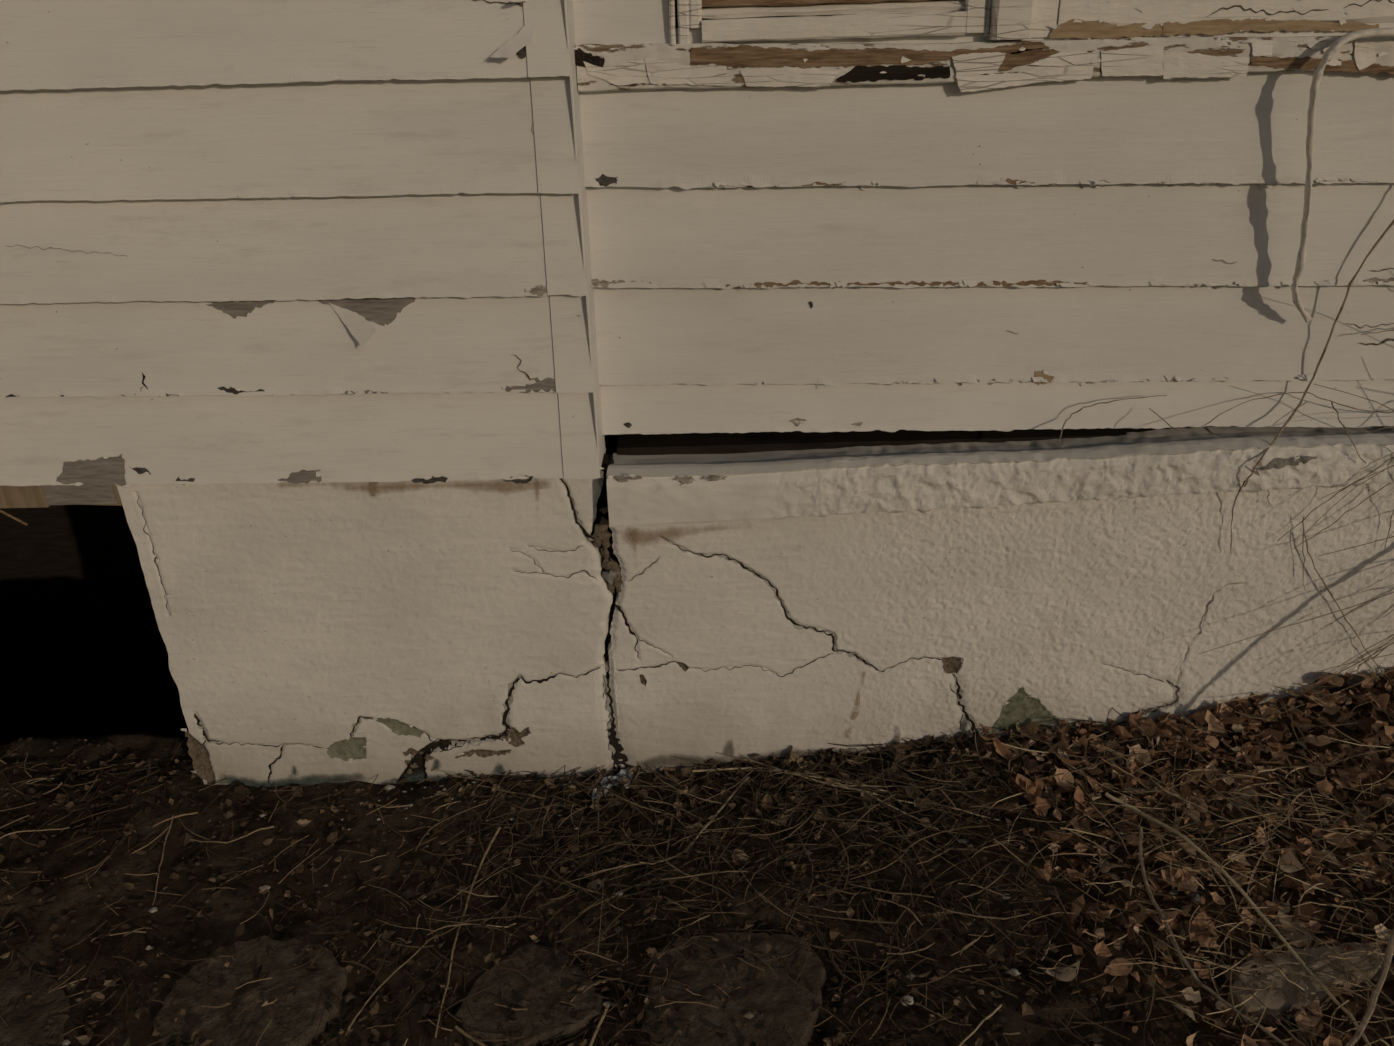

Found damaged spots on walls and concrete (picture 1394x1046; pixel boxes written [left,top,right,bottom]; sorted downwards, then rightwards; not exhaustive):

crack [1207,0,1394,21]
peeling [574,17,1394,323]
peeling [198,300,282,319]
peeling [307,297,416,347]
peeling [502,355,556,393]
peeling [56,454,151,487]
crack [425,454,980,771]
crack [193,713,373,783]